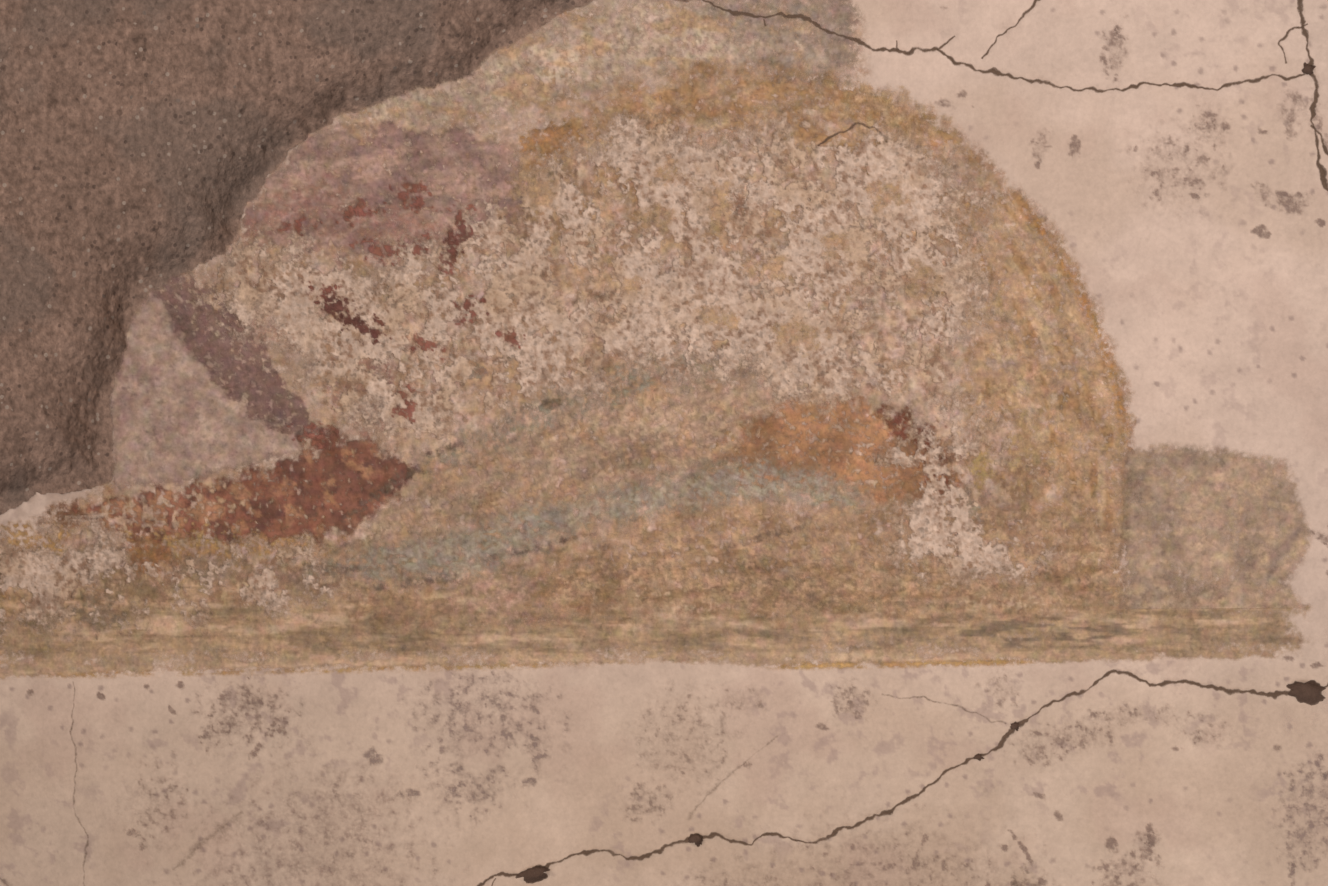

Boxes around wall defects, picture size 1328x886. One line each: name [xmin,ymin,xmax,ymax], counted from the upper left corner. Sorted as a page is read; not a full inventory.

crack [703,0,1328,191]
spalling [0,0,1057,587]
peeling [0,515,345,641]
crack [477,670,1328,886]